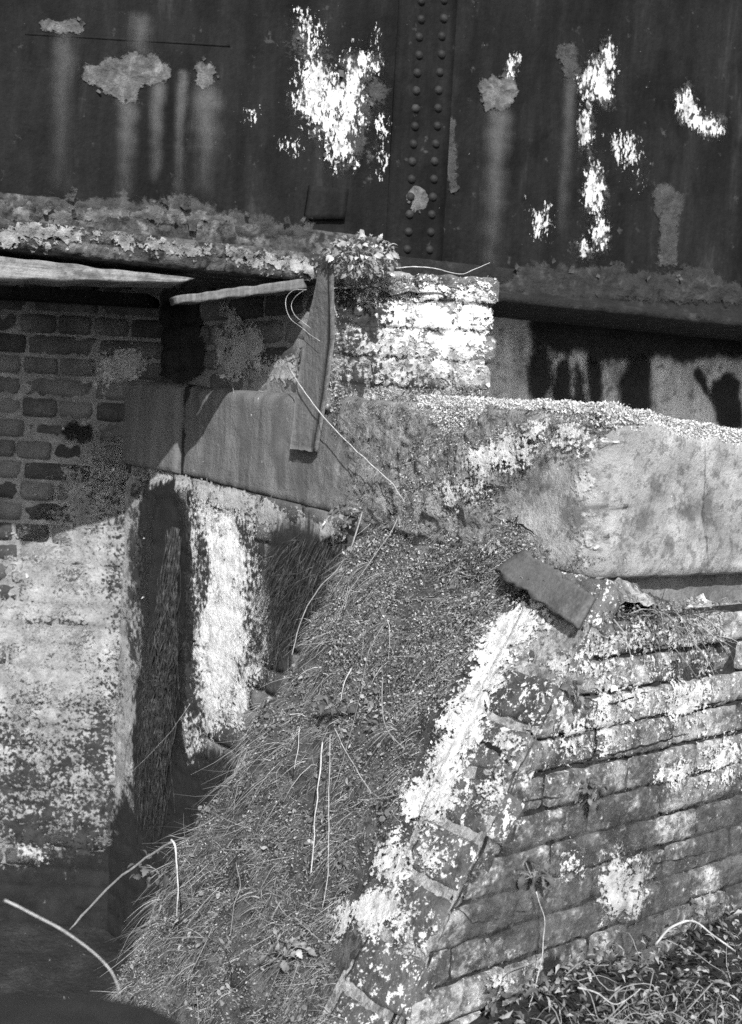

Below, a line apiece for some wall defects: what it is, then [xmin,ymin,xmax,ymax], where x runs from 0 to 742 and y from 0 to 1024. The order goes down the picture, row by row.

peeling [39,17,86,34]
peeling [277,5,390,182]
corrosion [478,74,520,112]
peeling [501,53,522,81]
corrosion [556,41,581,83]
peeling [674,81,727,138]
corrosion [447,118,460,193]
peeling [568,37,646,273]
peeling [532,201,553,242]
corrosion [652,183,684,269]